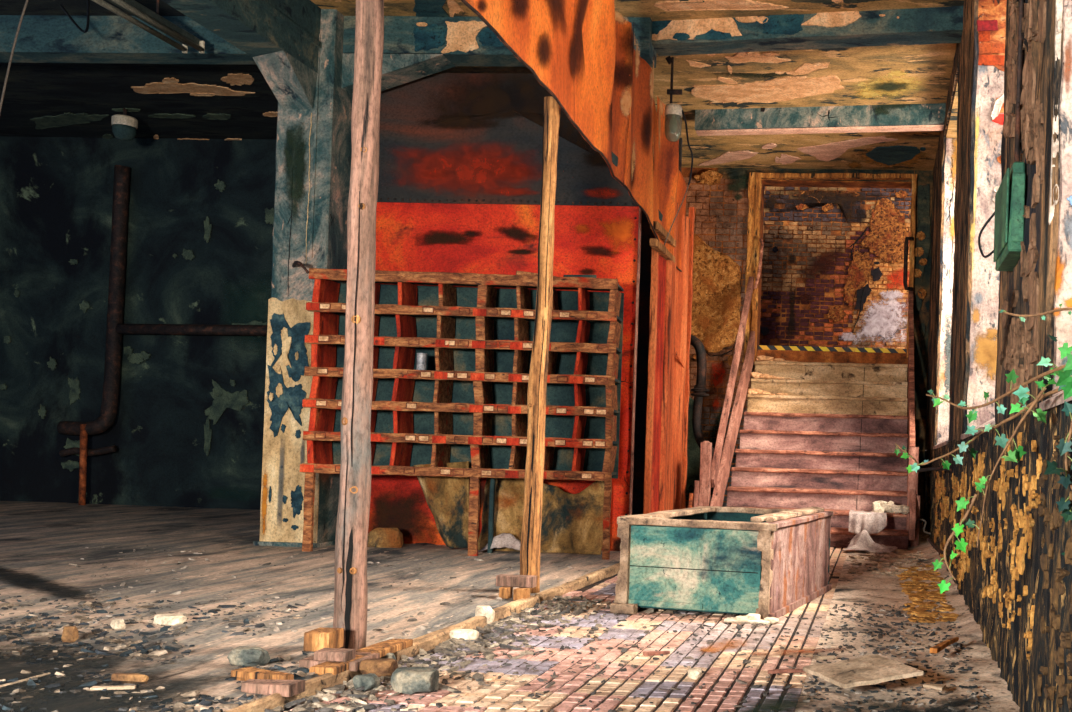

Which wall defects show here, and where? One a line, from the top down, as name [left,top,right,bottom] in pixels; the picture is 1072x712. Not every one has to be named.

peeling [413,0,505,54]
peeling [652,0,881,41]
peeling [131,73,255,96]
peeling [686,52,844,112]
rust [410,148,530,195]
rust [587,189,617,198]
peeling [694,136,926,186]
peeling [977,0,1072,407]
rust [603,219,633,248]
damp [842,269,909,341]
peeling [232,313,310,438]
peeling [269,485,304,530]